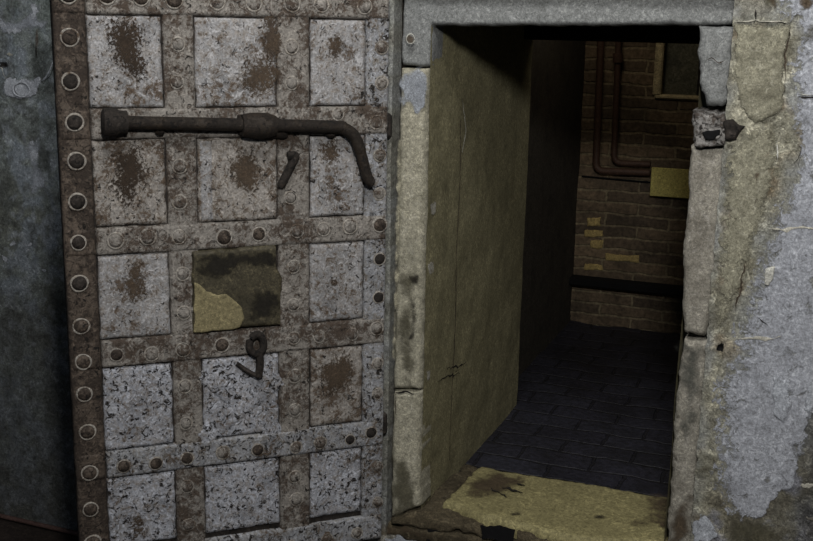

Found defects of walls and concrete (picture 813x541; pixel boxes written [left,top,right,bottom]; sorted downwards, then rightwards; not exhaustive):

corrosion [98,14,150,88]
corrosion [234,16,285,101]
corrosion [321,30,346,69]
corrosion [104,138,159,211]
corrosion [223,148,263,196]
corrosion [316,138,346,166]
corrosion [115,262,149,304]
peeling [710,0,813,521]
corrosion [315,349,354,398]
damp [469,473,525,497]
corrosion [122,512,150,540]
peeling [692,514,717,541]